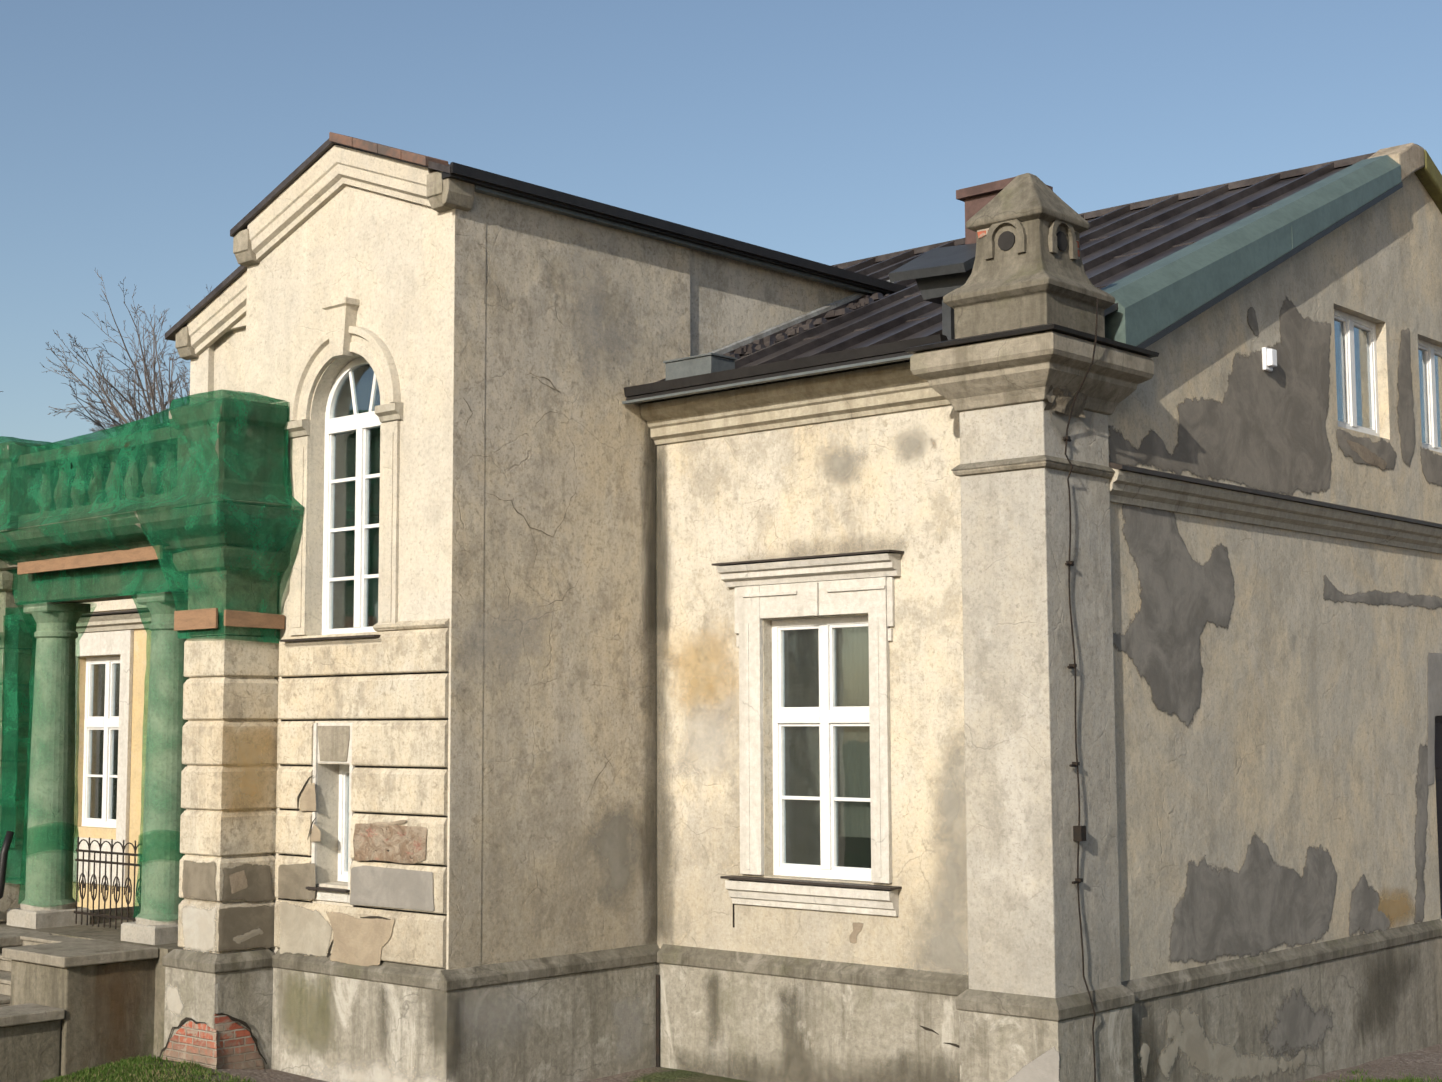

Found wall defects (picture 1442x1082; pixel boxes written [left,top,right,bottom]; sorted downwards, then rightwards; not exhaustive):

peeling [1247,307,1259,336]
leakage [590,431,669,934]
flaking render [159,1013,267,1070]
leakage [315,1063,439,1082]
leakage [693,996,960,1082]
peeling [1139,1006,1305,1082]